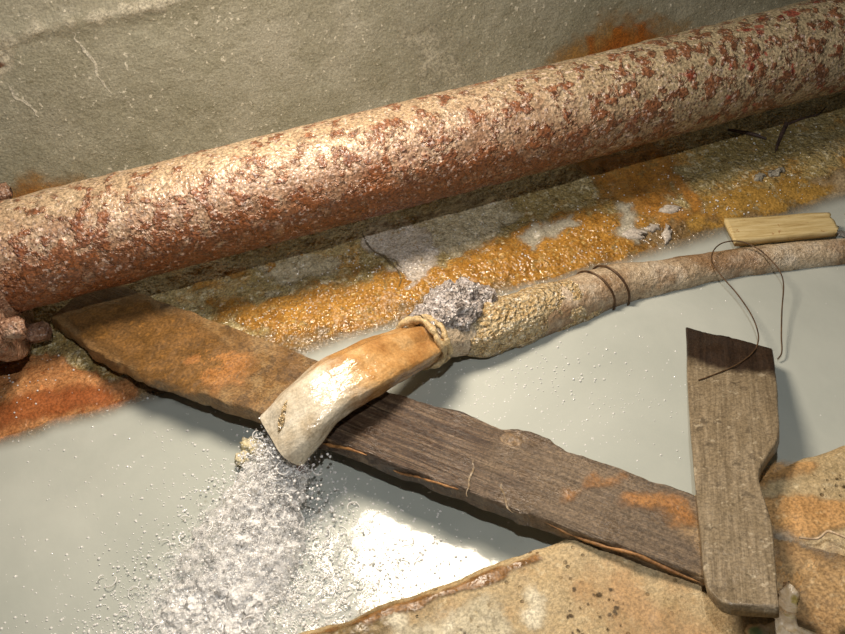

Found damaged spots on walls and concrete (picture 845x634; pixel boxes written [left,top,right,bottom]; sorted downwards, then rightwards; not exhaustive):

rust [557,24,657,62]
rust [12,176,63,199]
water stain [520,215,579,250]
water stain [616,203,638,242]
water stain [361,218,438,287]
rust [0,353,138,442]